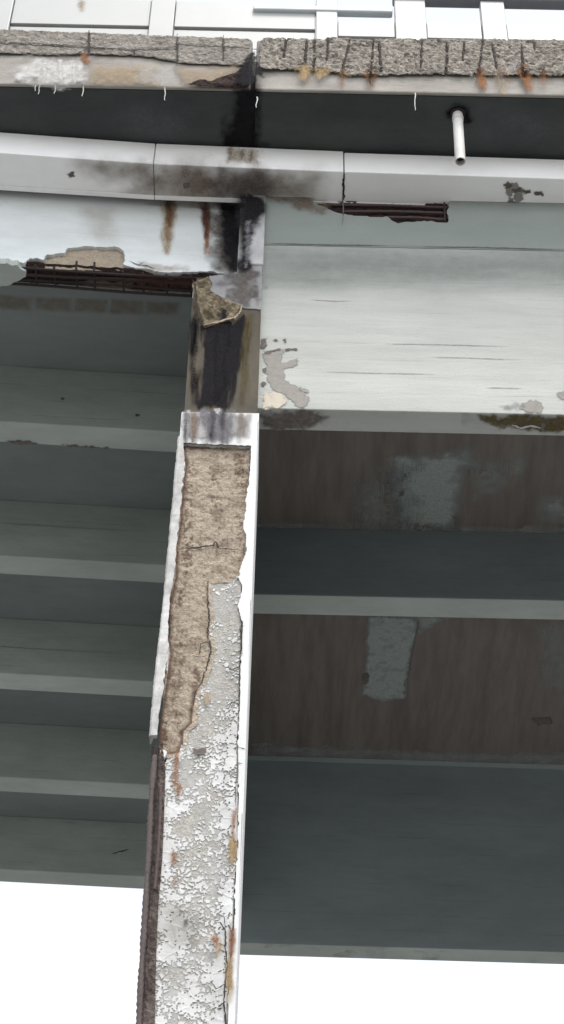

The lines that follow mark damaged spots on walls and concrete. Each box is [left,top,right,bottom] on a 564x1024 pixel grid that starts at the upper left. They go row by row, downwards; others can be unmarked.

leakage [15,58,160,85]
corrosion [298,65,329,80]
corrosion [516,62,531,90]
corrosion [163,200,175,253]
corrosion [201,202,210,252]
leakage [147,52,327,444]
spalling [318,198,448,223]
peeling [503,182,544,203]
spalling [11,249,243,328]
peeling [260,338,309,408]
peeling [136,443,251,1024]
corrosion [212,930,234,988]